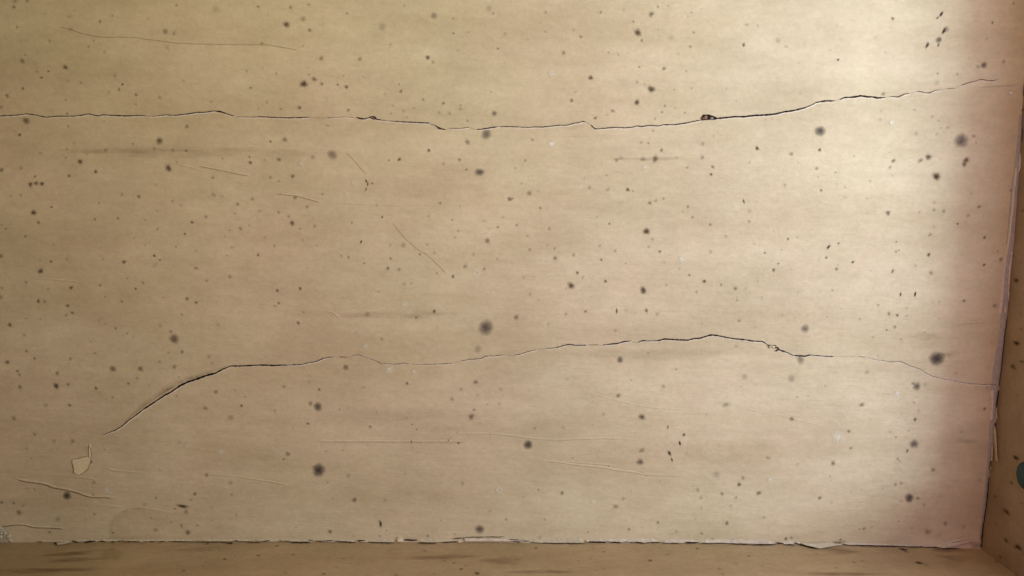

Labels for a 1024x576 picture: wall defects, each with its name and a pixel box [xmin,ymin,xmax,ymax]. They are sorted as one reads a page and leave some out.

crack [0,79,998,131]
crack [102,319,1007,436]